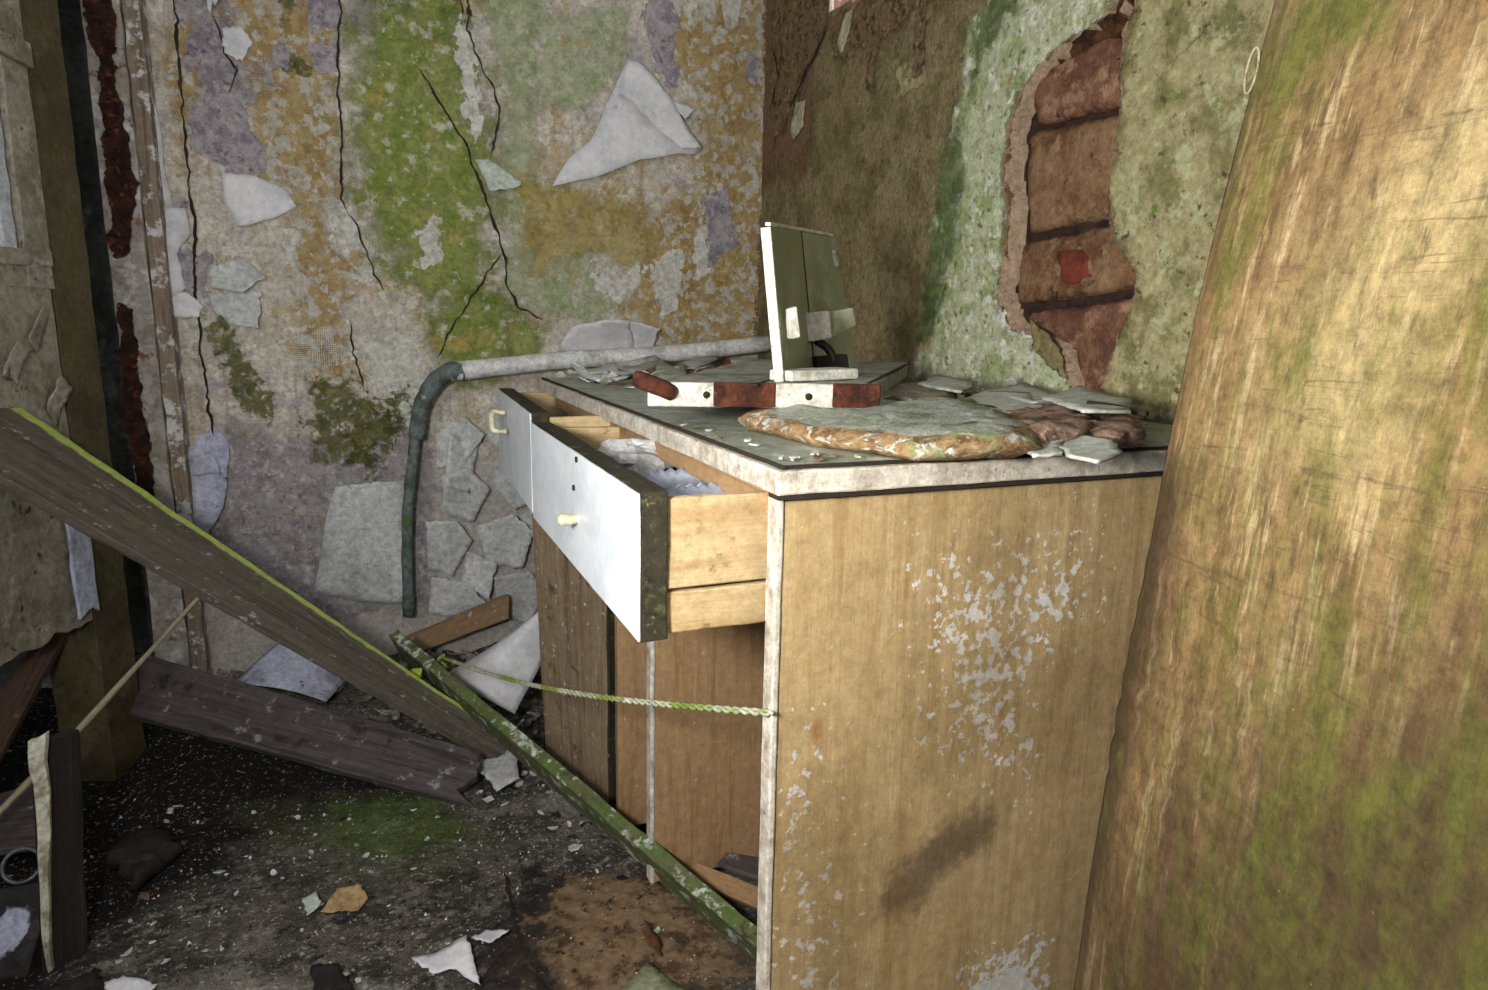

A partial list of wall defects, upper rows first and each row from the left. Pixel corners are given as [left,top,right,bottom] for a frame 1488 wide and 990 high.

rust [82,0,141,259]
crack [173,0,238,436]
crack [336,0,384,291]
crack [419,0,542,359]
peeling [553,0,742,186]
water stain [427,0,932,388]
water stain [920,127,964,342]
water stain [969,0,1016,95]
spalling [918,30,1136,403]
rust [115,303,155,497]
peeling [315,479,404,604]
peeling [426,412,538,623]